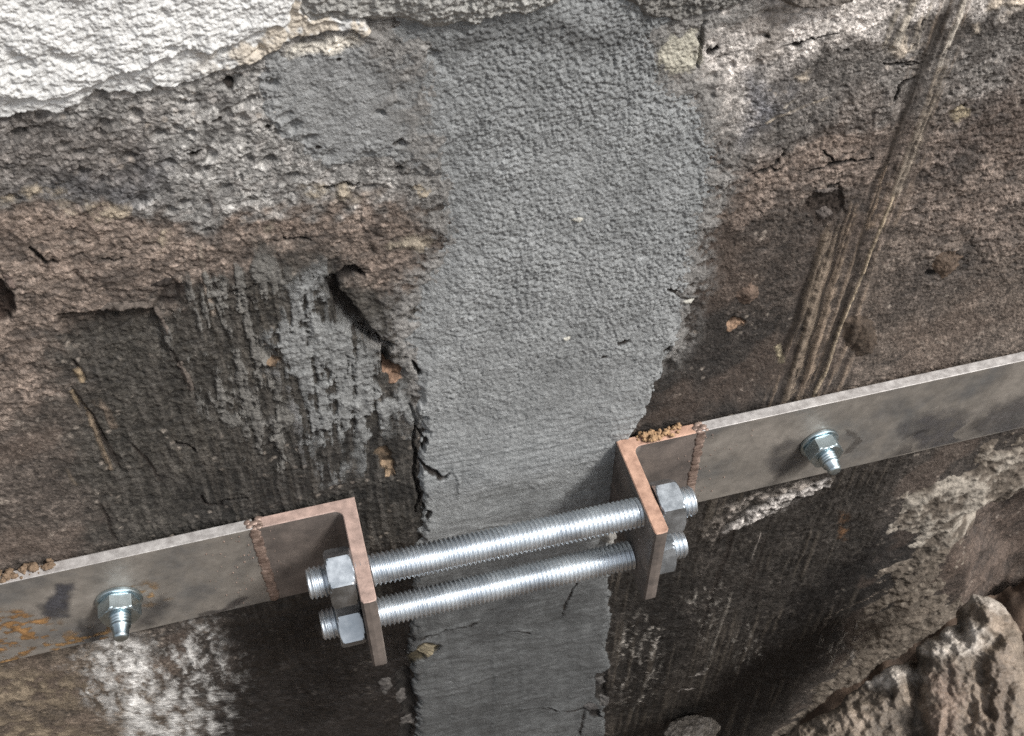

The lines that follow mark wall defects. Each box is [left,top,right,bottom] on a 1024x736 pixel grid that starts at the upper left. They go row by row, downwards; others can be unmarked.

peeling [0,0,295,101]
crack [758,149,786,172]
crack [809,150,874,171]
peeling [96,205,130,221]
peeling [338,182,350,199]
peeling [388,236,429,250]
crack [324,264,392,365]
crack [409,403,447,519]
leakage [694,480,827,605]
rust [0,611,110,663]
leakage [93,629,214,736]